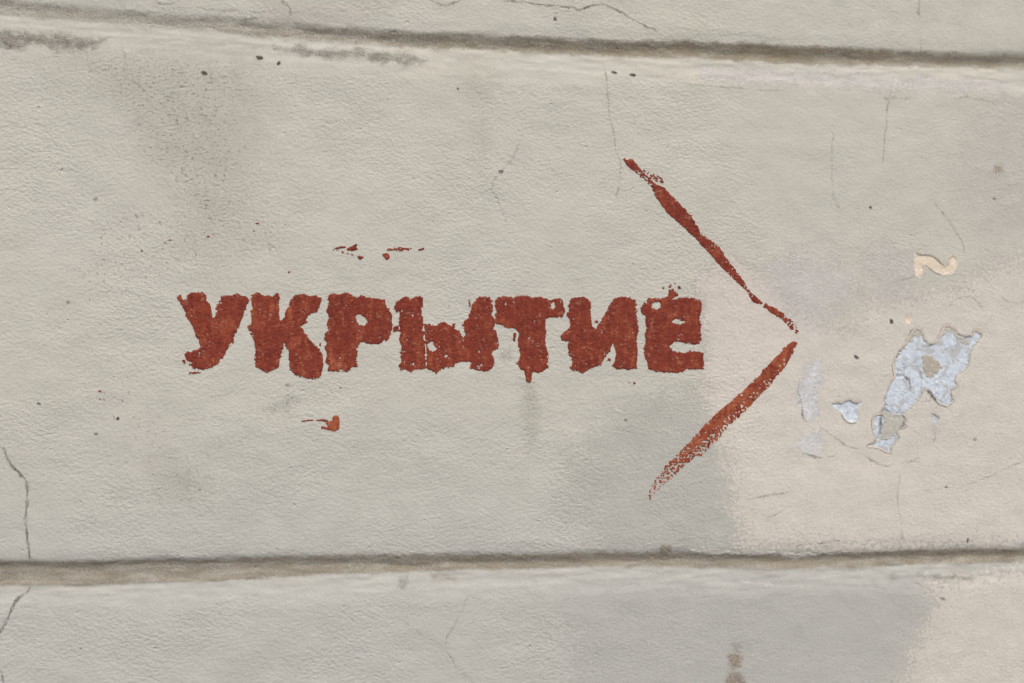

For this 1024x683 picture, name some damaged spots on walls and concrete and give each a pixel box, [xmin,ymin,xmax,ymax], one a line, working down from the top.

peeling [913,251,958,278]
peeling [831,399,862,424]
peeling [867,313,983,455]
crack [0,447,31,633]